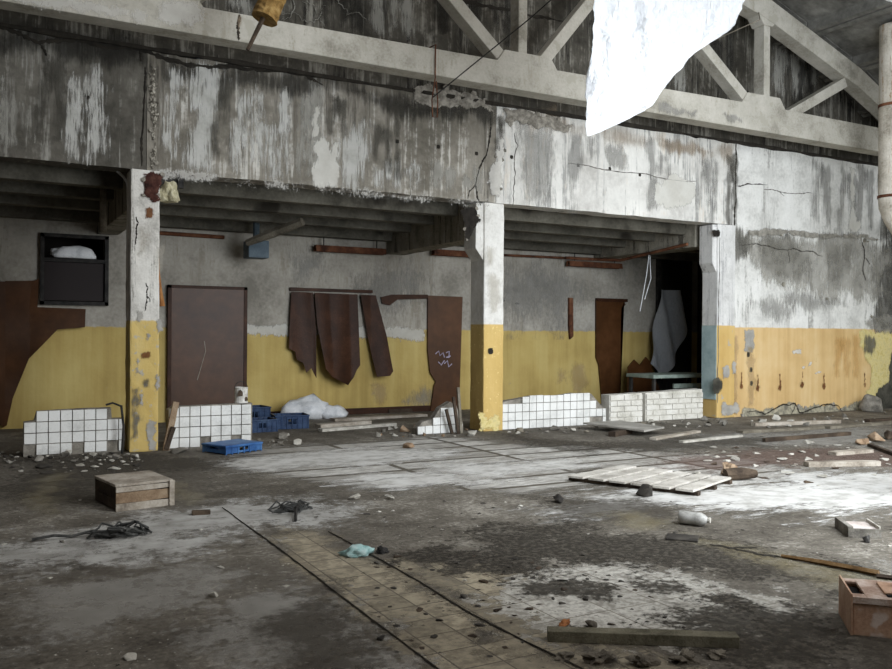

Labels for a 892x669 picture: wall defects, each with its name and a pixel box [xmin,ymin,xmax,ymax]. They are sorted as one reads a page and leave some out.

damp [0,32,144,165]
damp [160,61,504,201]
crack [468,118,492,206]
crack [511,133,519,206]
crack [734,145,810,225]
crack [742,243,821,261]
peeling [132,359,160,451]
peeling [713,314,892,417]